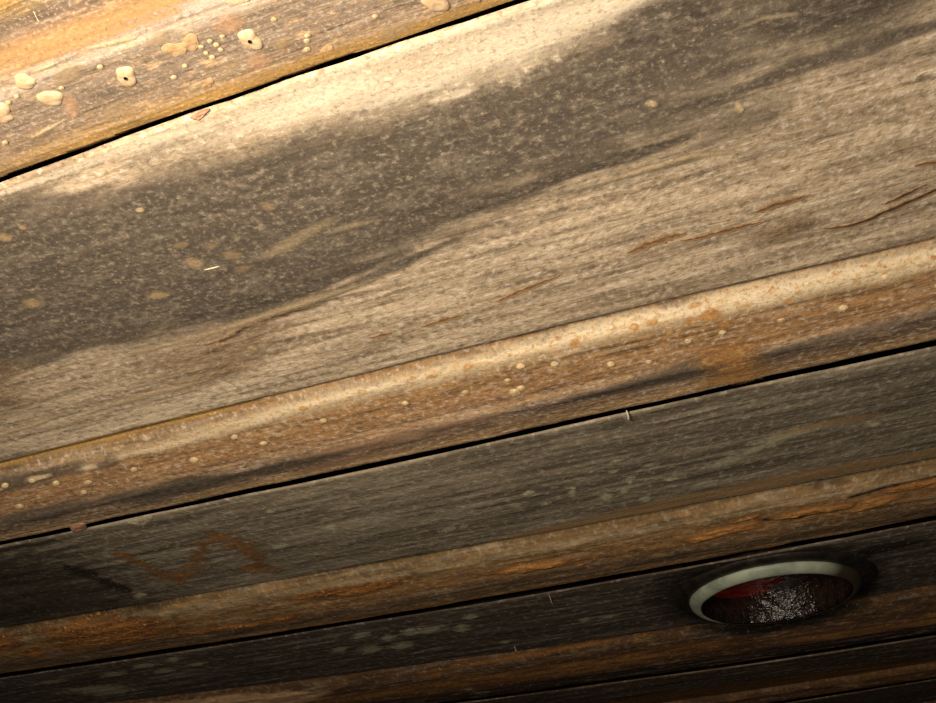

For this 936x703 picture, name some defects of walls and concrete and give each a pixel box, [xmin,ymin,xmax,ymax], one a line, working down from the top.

damp [0,0,923,376]
crack [824,160,936,230]
damp [504,378,525,396]